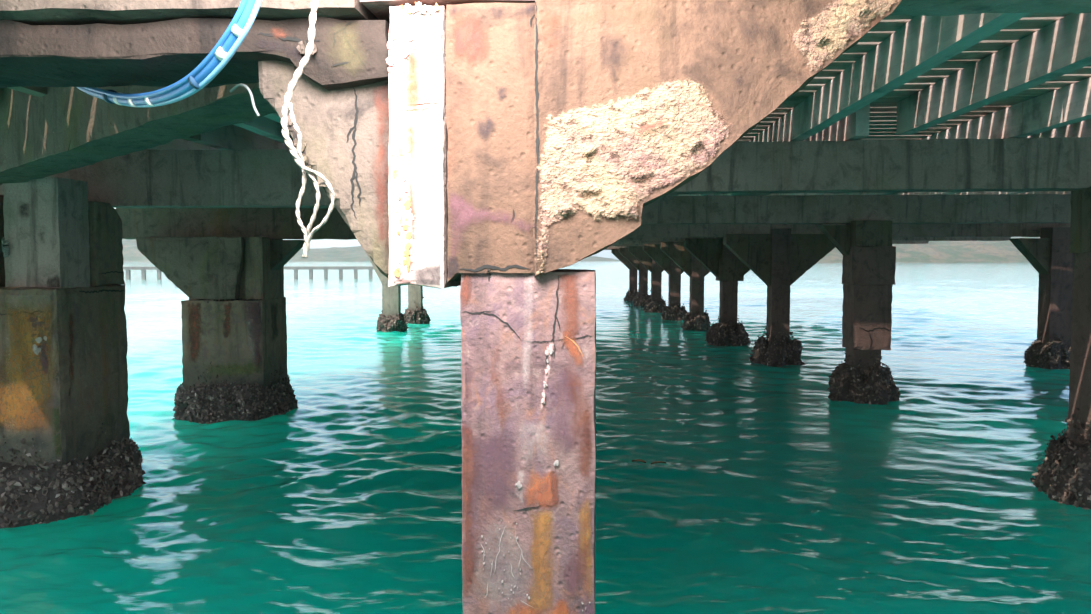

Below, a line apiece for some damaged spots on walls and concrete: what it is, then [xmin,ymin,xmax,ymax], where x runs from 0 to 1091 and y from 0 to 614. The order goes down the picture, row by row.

crack [257,21,365,219]
peeling [386,2,442,285]
crack [459,1,592,370]
spalling [536,79,732,277]
rust [0,306,54,429]
rust [189,303,201,362]
crack [861,327,891,350]
rust [511,474,568,614]